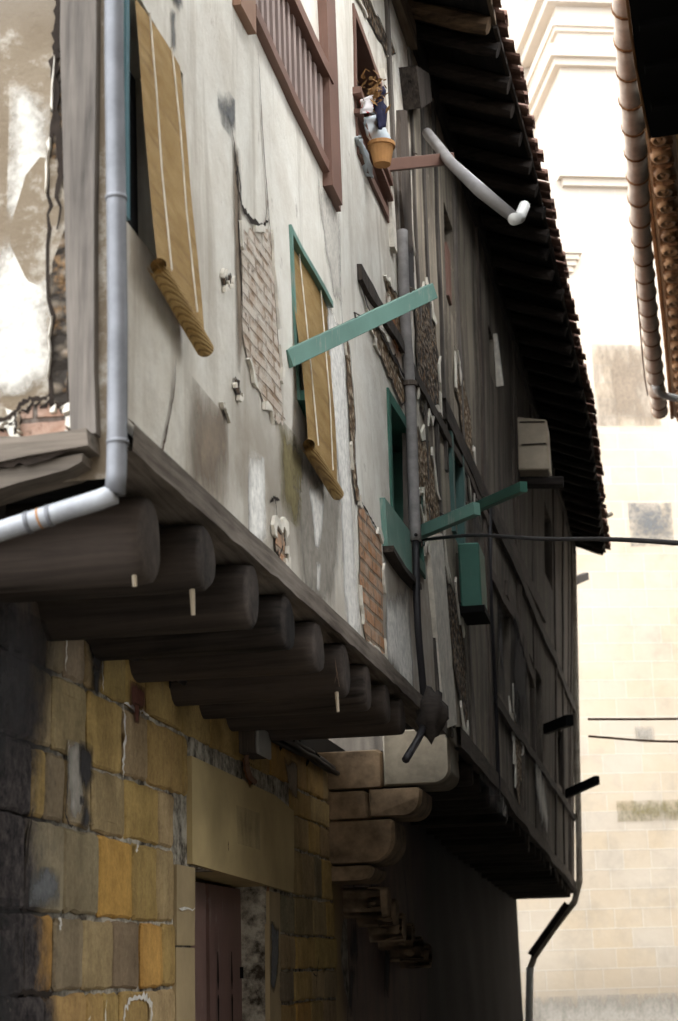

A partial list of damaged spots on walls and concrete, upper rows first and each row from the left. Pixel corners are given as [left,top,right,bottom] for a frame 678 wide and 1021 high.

spalling [0,48,70,436]
spalling [219,220,286,426]
spalling [370,316,405,405]
spalling [384,274,399,303]
spalling [415,301,444,524]
spalling [453,345,477,466]
leakage [594,345,655,426]
spalling [344,341,388,659]
leakage [628,503,671,546]
spalling [421,530,469,735]
leakage [617,800,678,821]